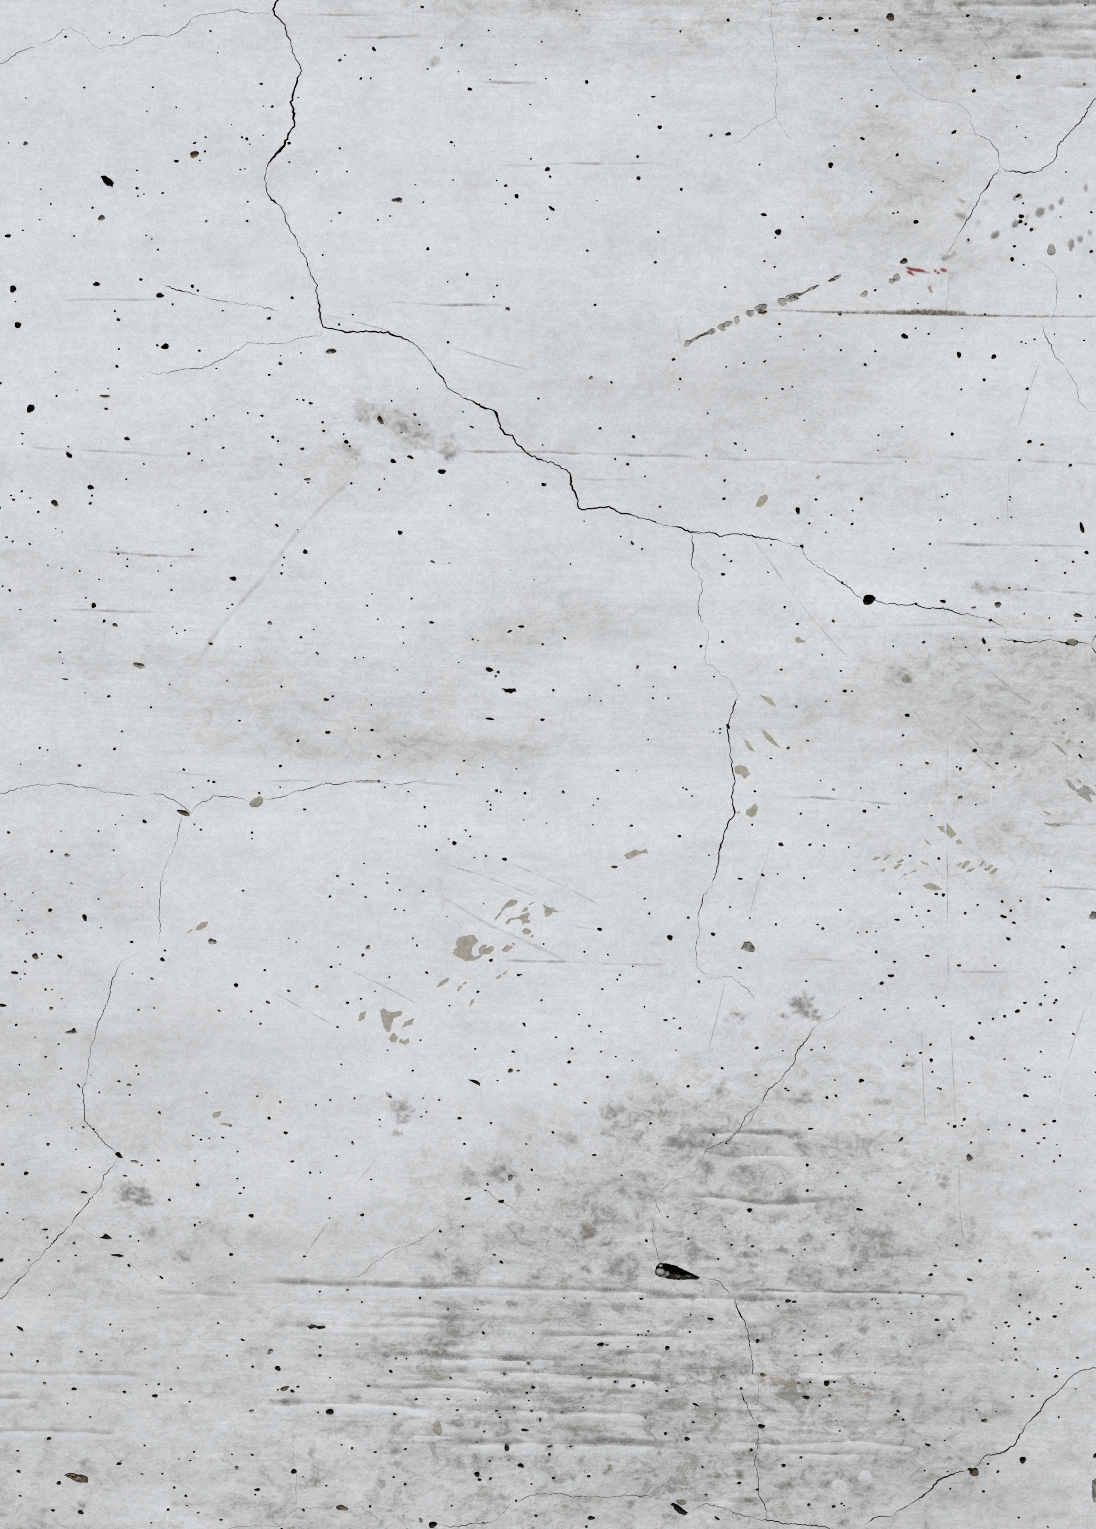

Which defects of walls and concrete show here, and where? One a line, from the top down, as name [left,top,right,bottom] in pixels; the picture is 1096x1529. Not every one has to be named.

crack [0,0,1096,997]
crack [0,779,426,1299]
crack [435,1279,1095,1529]